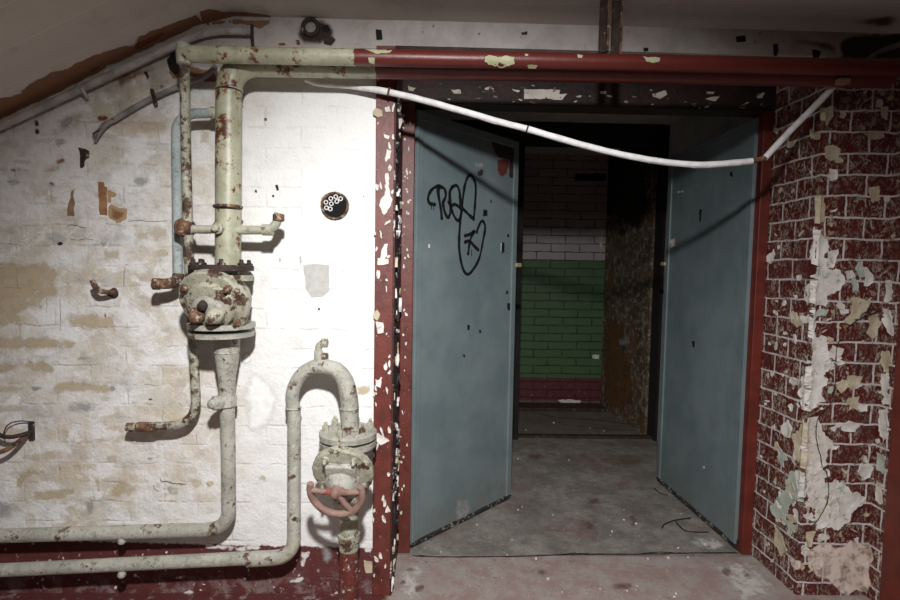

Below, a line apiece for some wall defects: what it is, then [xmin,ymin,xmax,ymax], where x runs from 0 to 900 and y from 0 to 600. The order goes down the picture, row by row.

peeling [512,85,612,104]
peeling [624,89,667,105]
peeling [809,106,847,181]
peeling [67,190,75,216]
peeling [98,182,127,223]
peeling [868,186,890,203]
peeling [358,80,424,599]
spalling [766,195,894,595]
peeling [205,543,260,551]
peeling [290,551,310,582]